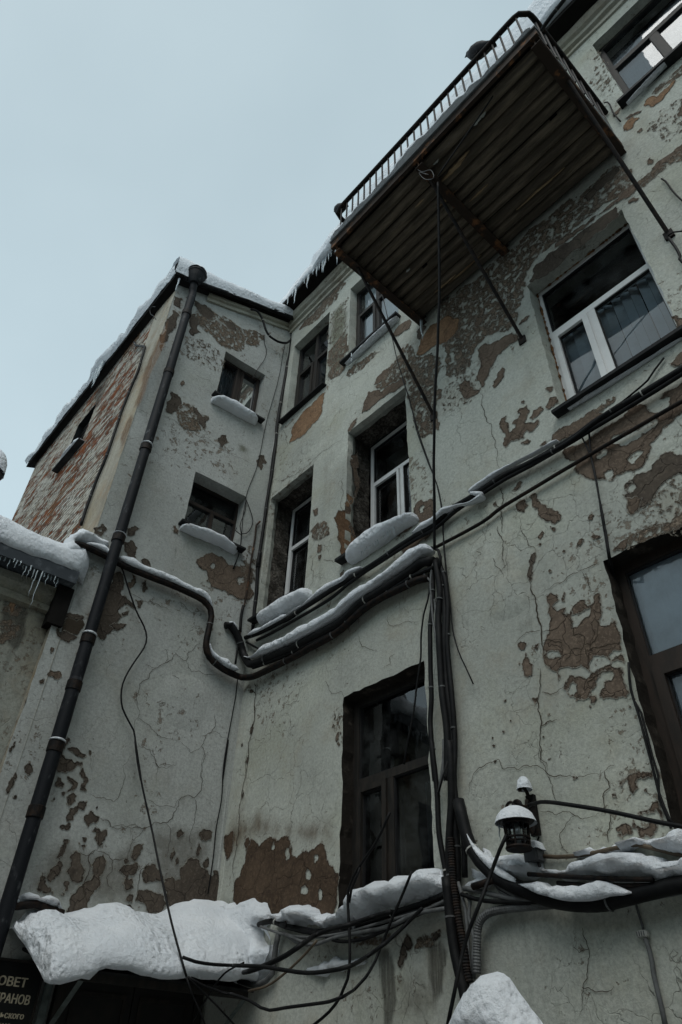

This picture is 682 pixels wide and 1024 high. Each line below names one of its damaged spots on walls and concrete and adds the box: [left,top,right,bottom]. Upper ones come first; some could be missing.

peeling [159,296,265,371]
peeling [348,65,682,438]
peeling [36,737,108,913]
crack [81,640,256,907]
peeling [196,546,257,600]
peeling [118,829,340,914]
crack [455,309,535,574]
peeling [511,481,562,582]
crack [469,564,620,853]
peeling [517,592,631,708]
peeling [499,383,682,552]
crack [574,928,614,1013]